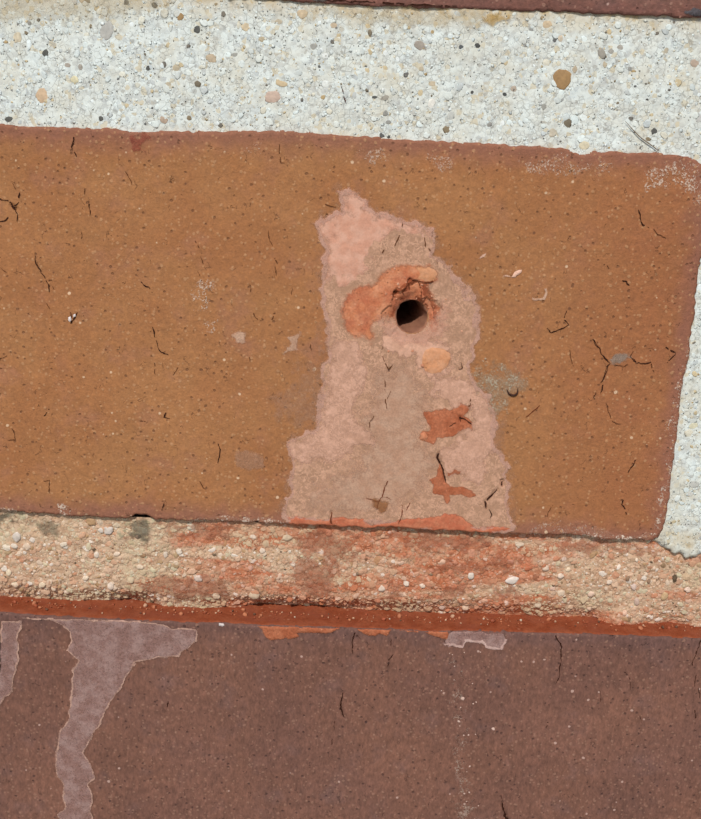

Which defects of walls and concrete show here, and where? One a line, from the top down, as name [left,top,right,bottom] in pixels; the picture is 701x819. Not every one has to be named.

peeling [394,266,438,295]
crack [592,339,676,424]